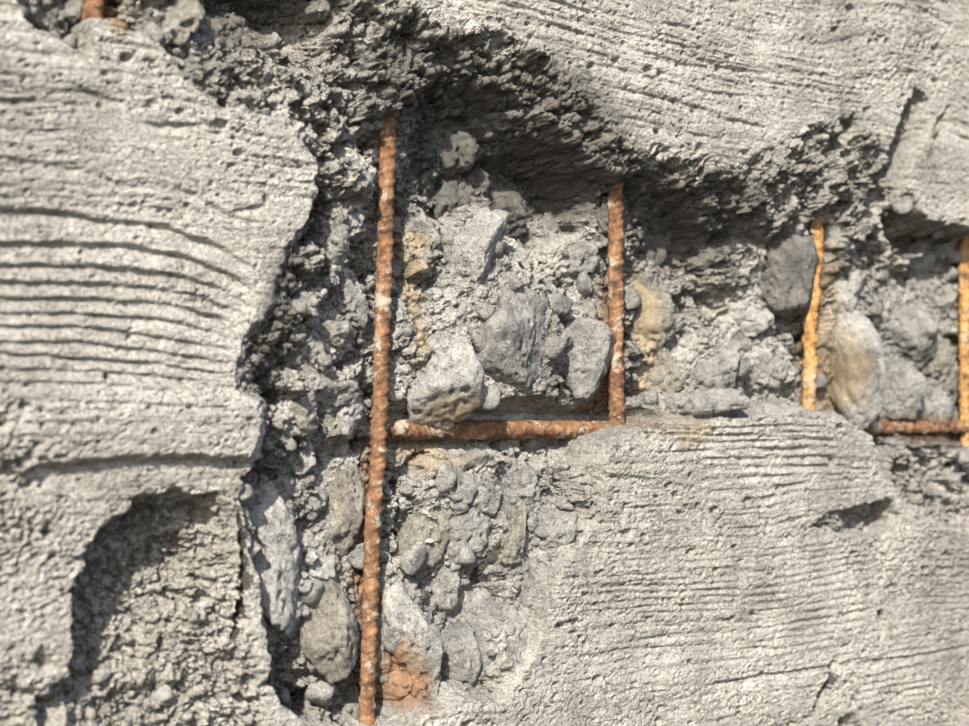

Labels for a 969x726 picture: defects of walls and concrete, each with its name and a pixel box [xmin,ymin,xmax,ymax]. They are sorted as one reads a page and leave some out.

spalling [17,0,616,726]
corrosion [583,368,610,421]
spalling [371,85,969,726]
corrosion [882,419,959,440]
corrosion [356,512,365,543]
corrosion [355,569,364,651]